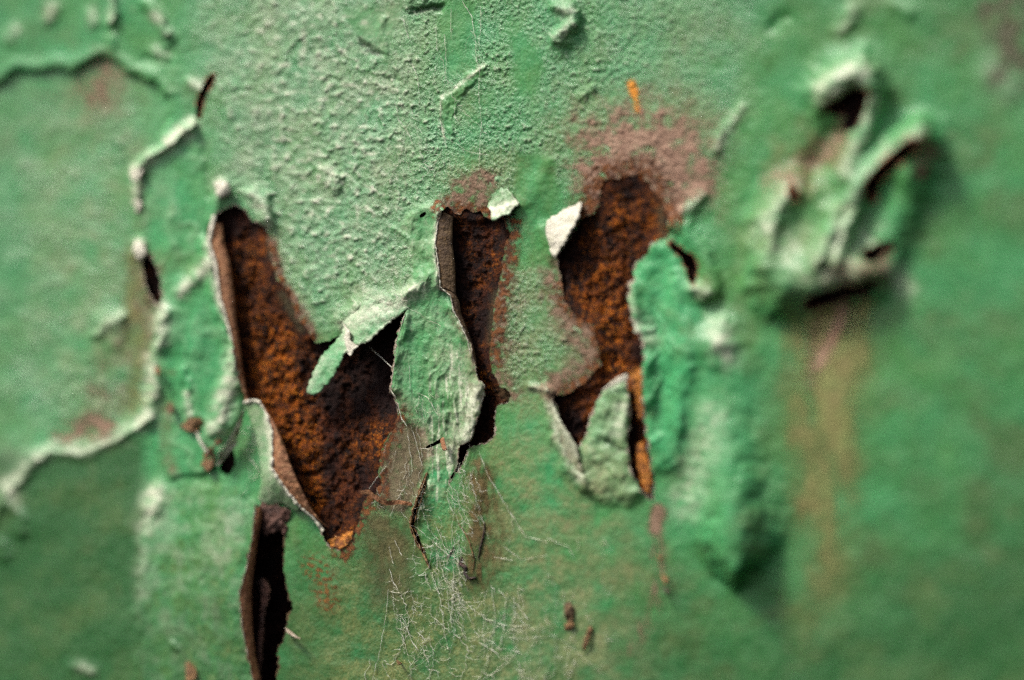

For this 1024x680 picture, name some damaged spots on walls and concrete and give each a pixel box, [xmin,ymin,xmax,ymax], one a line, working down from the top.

crack [194,72,217,119]
rust [442,170,496,220]
rust [567,81,717,220]
peeling [0,58,521,680]
rust [492,219,518,400]
rust [540,258,599,399]
peeling [545,155,702,503]